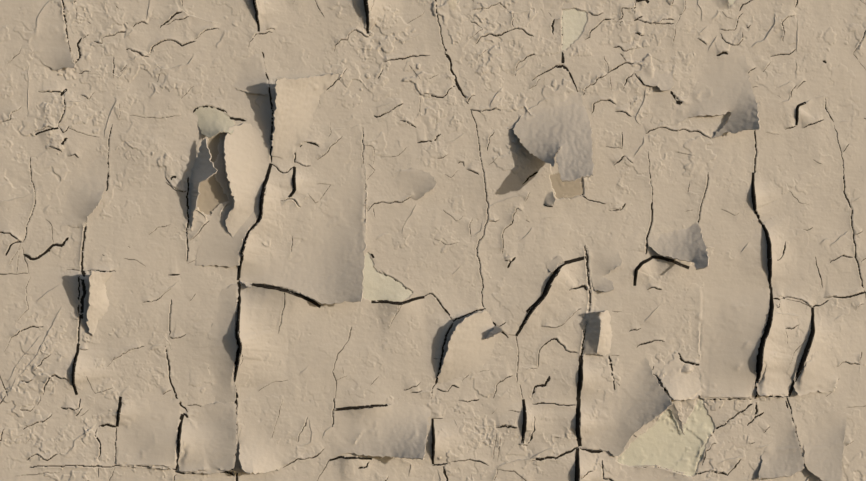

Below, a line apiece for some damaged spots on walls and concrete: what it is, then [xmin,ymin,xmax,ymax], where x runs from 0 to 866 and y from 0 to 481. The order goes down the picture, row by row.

crack [35,88,246,191]
peeling [165,70,437,305]
peeling [513,62,674,207]
crack [0,157,146,481]
peeling [86,270,116,336]
crack [165,295,201,474]
peeling [116,383,443,480]
crack [317,456,372,481]
crack [332,327,388,427]
peeling [437,310,503,392]
peeling [581,282,862,481]
crack [688,95,866,468]